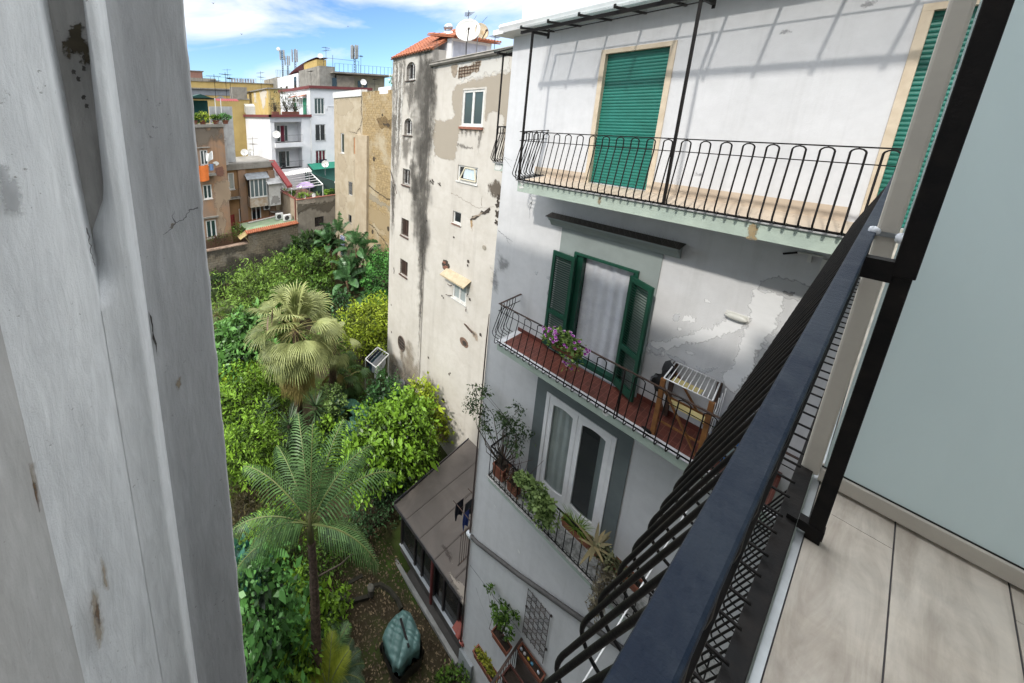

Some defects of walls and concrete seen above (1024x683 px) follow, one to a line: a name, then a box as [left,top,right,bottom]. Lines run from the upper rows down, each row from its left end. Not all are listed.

spalling [451,60,481,79]
leakage [391,45,439,313]
crack [163,207,198,235]
corrosion [91,563,108,641]